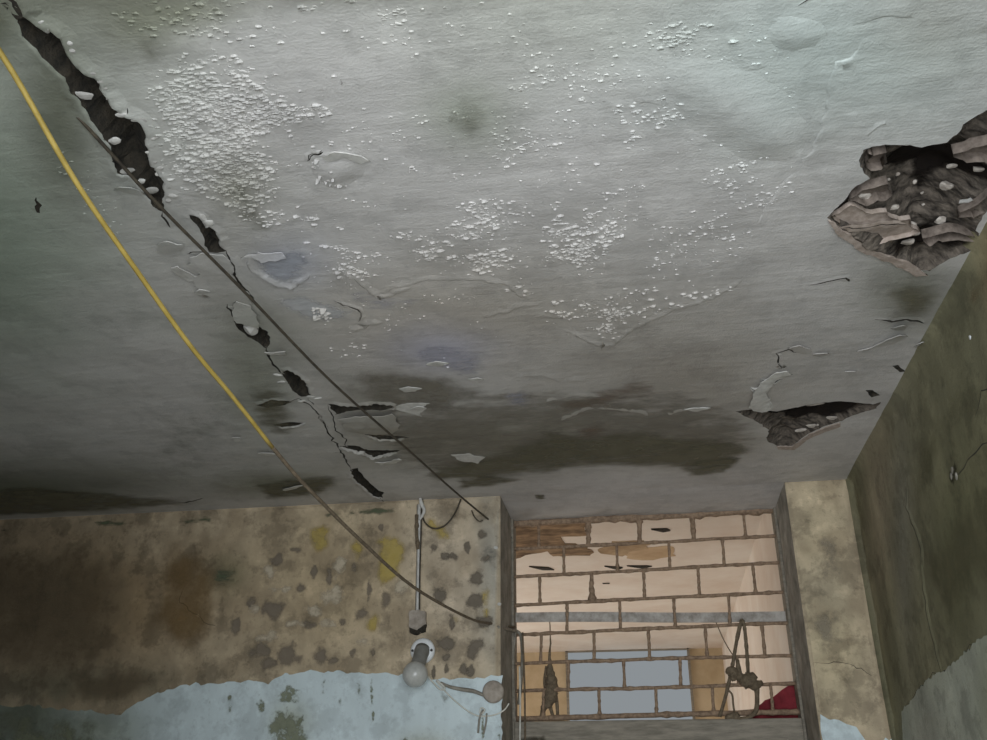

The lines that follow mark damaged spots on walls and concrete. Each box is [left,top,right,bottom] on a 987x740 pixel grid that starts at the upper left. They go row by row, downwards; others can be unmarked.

crack [0,0,287,374]
spalling [827,110,987,277]
leakage [368,376,741,487]
spalling [736,371,881,450]
leakage [263,478,331,497]
crack [345,468,388,502]
flaking render [247,557,356,628]
peeling [367,525,412,607]
flaking render [466,572,501,627]
peeling [0,610,503,740]
peeling [820,714,865,740]
peeling [884,635,987,740]